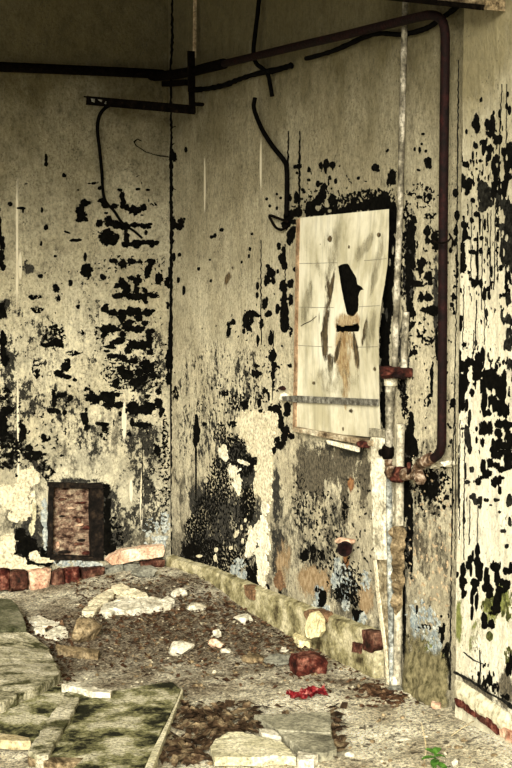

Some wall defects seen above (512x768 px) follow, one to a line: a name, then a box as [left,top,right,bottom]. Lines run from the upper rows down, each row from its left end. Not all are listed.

peeling [0,202,26,271]
peeling [0,278,20,320]
peeling [28,294,44,313]
peeling [0,312,81,480]
peeling [52,175,186,549]
peeling [179,91,512,685]
water stain [174,343,263,567]
peeling [14,483,124,568]
peeling [472,663,510,701]